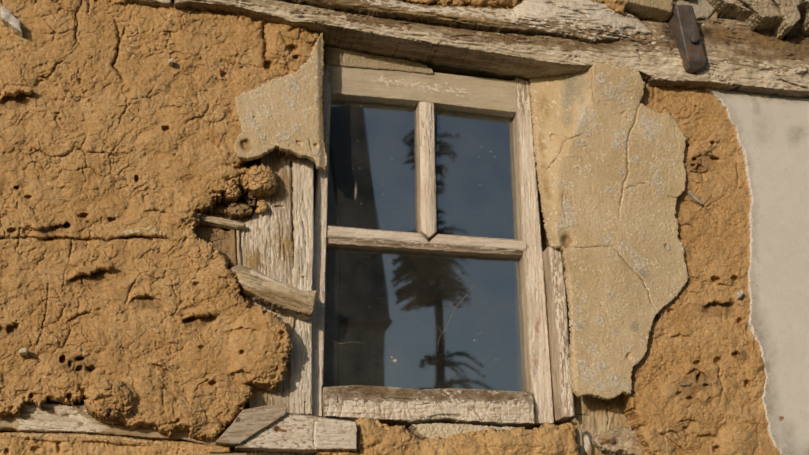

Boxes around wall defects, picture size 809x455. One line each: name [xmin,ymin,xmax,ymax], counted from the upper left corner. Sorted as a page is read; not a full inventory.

spalling [0,6,23,38]
crack [75,0,90,45]
crack [112,22,125,83]
peeling [148,0,809,91]
crack [35,144,119,157]
crack [620,118,645,206]
spalling [30,222,62,233]
crack [0,226,191,263]
spalling [72,262,115,285]
crack [575,246,657,312]
spalling [706,290,744,315]
peeling [18,405,109,433]